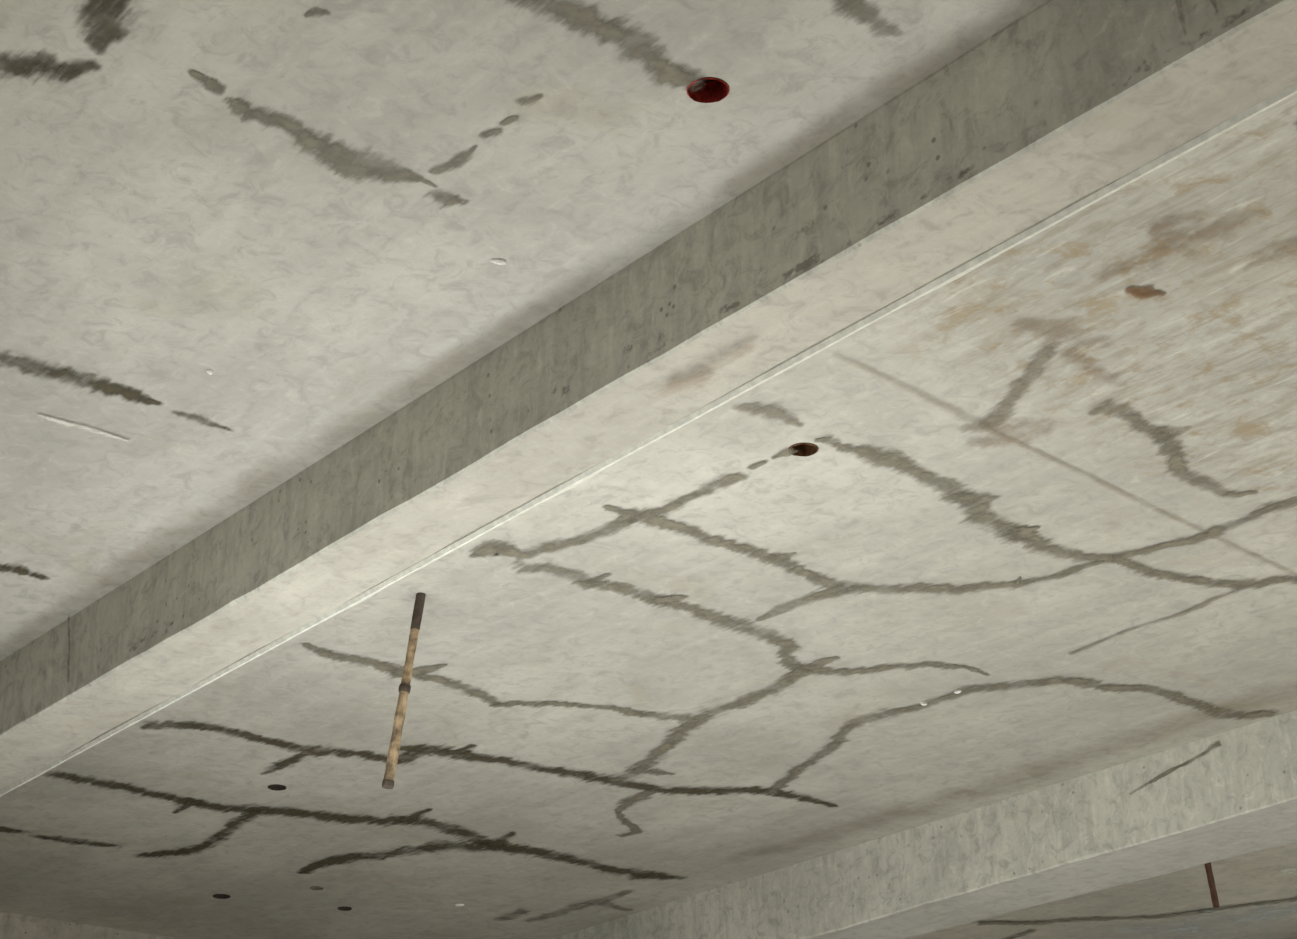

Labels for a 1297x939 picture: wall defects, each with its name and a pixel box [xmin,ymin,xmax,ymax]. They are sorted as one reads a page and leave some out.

crack [0,0,129,81]
crack [510,0,703,87]
crack [189,70,542,207]
crack [0,356,230,431]
crack [0,437,1297,921]
rust [382,779,394,789]
crack [979,898,1297,939]